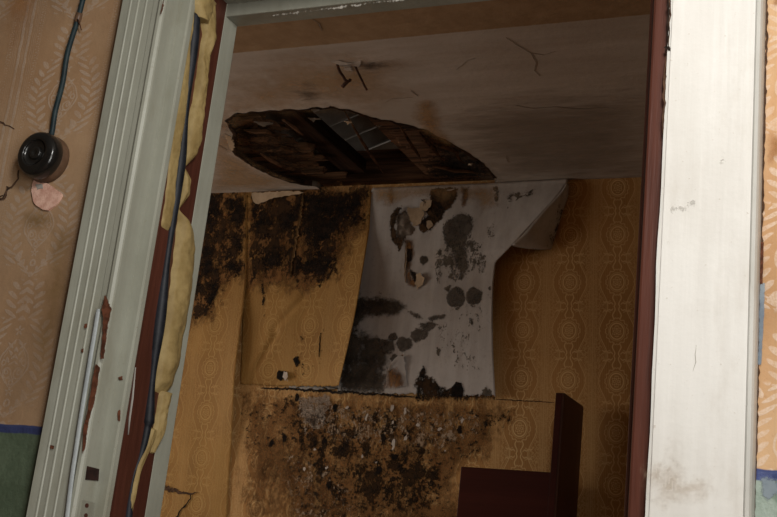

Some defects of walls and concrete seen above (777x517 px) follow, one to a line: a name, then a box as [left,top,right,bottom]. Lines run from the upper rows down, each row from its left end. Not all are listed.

crack [0,170,19,200]
damp [191,157,369,322]
flaking render [407,187,458,233]
damp [419,103,533,330]
peeling [65,295,112,517]
damp [234,293,510,517]
crack [164,485,196,517]